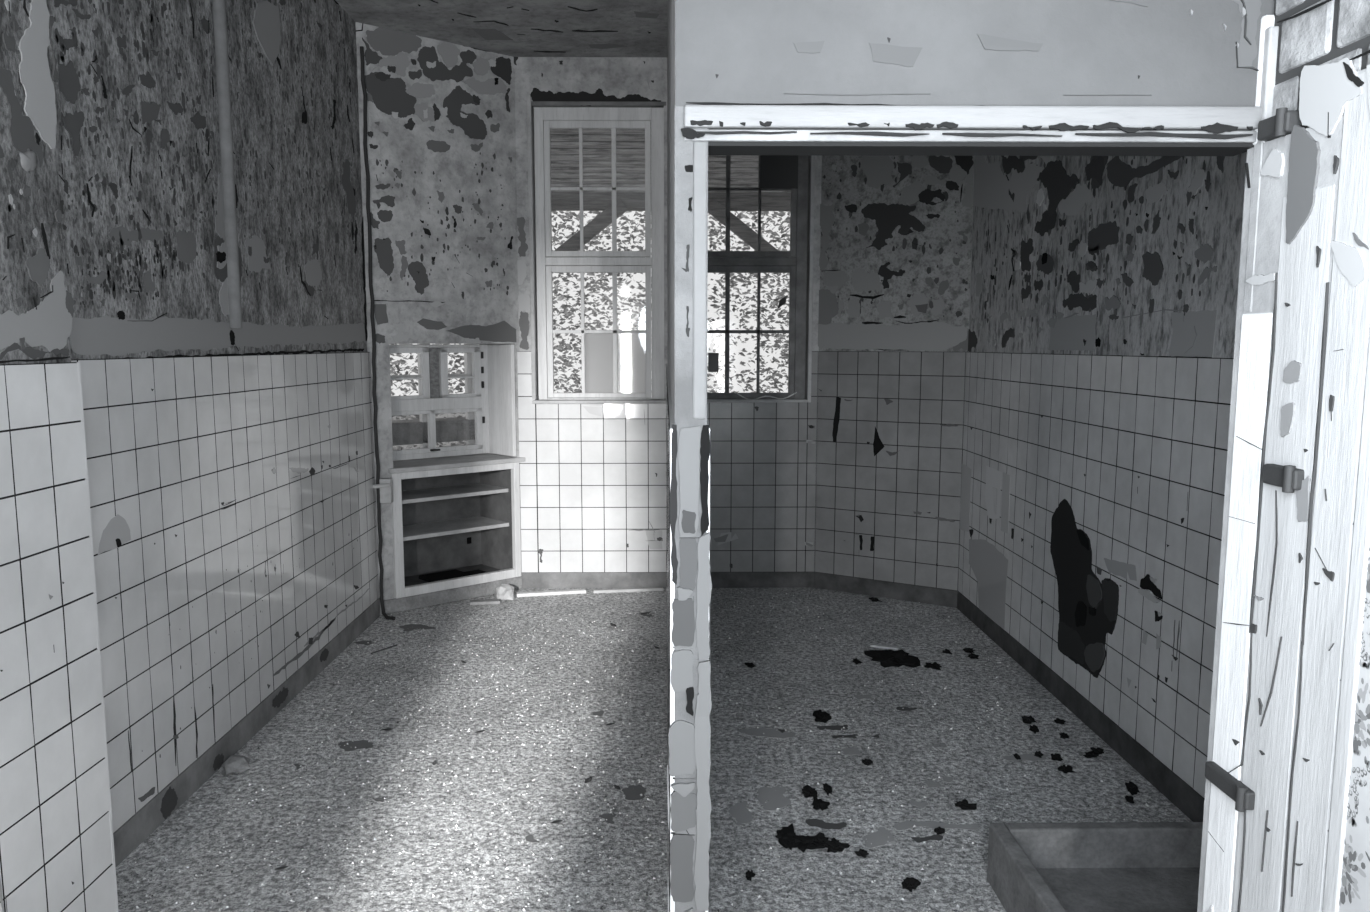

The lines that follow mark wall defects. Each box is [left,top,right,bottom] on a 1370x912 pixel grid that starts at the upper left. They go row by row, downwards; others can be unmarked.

crack [1235,0,1332,71]
peeling [1201,122,1253,134]
peeling [818,280,883,325]
peeling [892,238,966,318]
peeling [962,156,1149,323]
peeling [1173,156,1211,316]
peeling [657,424,696,585]